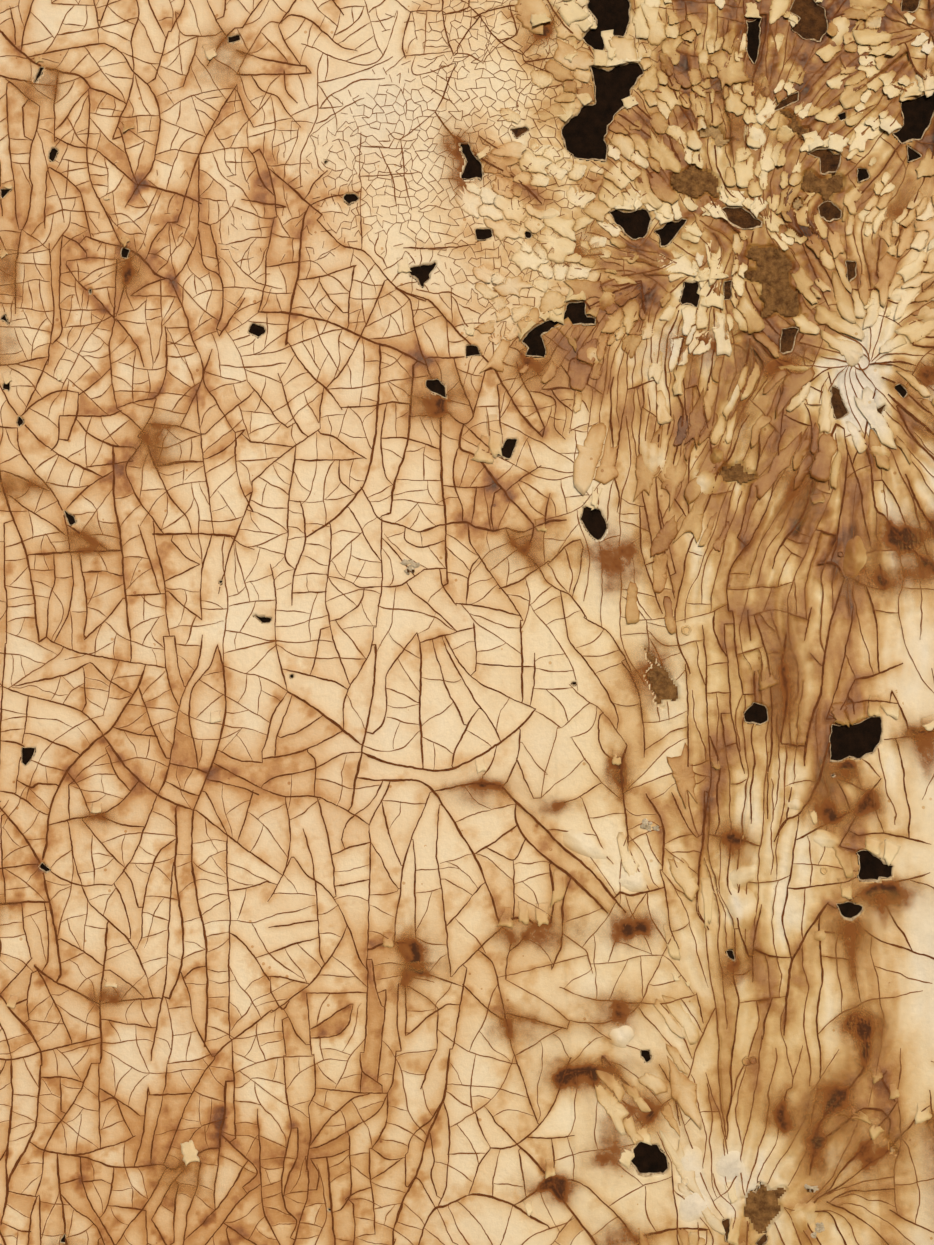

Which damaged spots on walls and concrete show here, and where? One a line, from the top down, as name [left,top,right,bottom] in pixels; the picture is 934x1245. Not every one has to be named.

crack [630,32,840,297]
crack [817,0,934,295]
peeling [454,0,934,636]
crack [688,300,934,483]
corrosion [632,641,678,704]
peeling [829,695,899,777]
corrosion [610,911,656,945]
peeling [820,836,901,921]
corrosion [593,1095,664,1168]
peeling [595,994,768,1245]
corrosion [744,1184,786,1234]
crack [784,1021,934,1245]